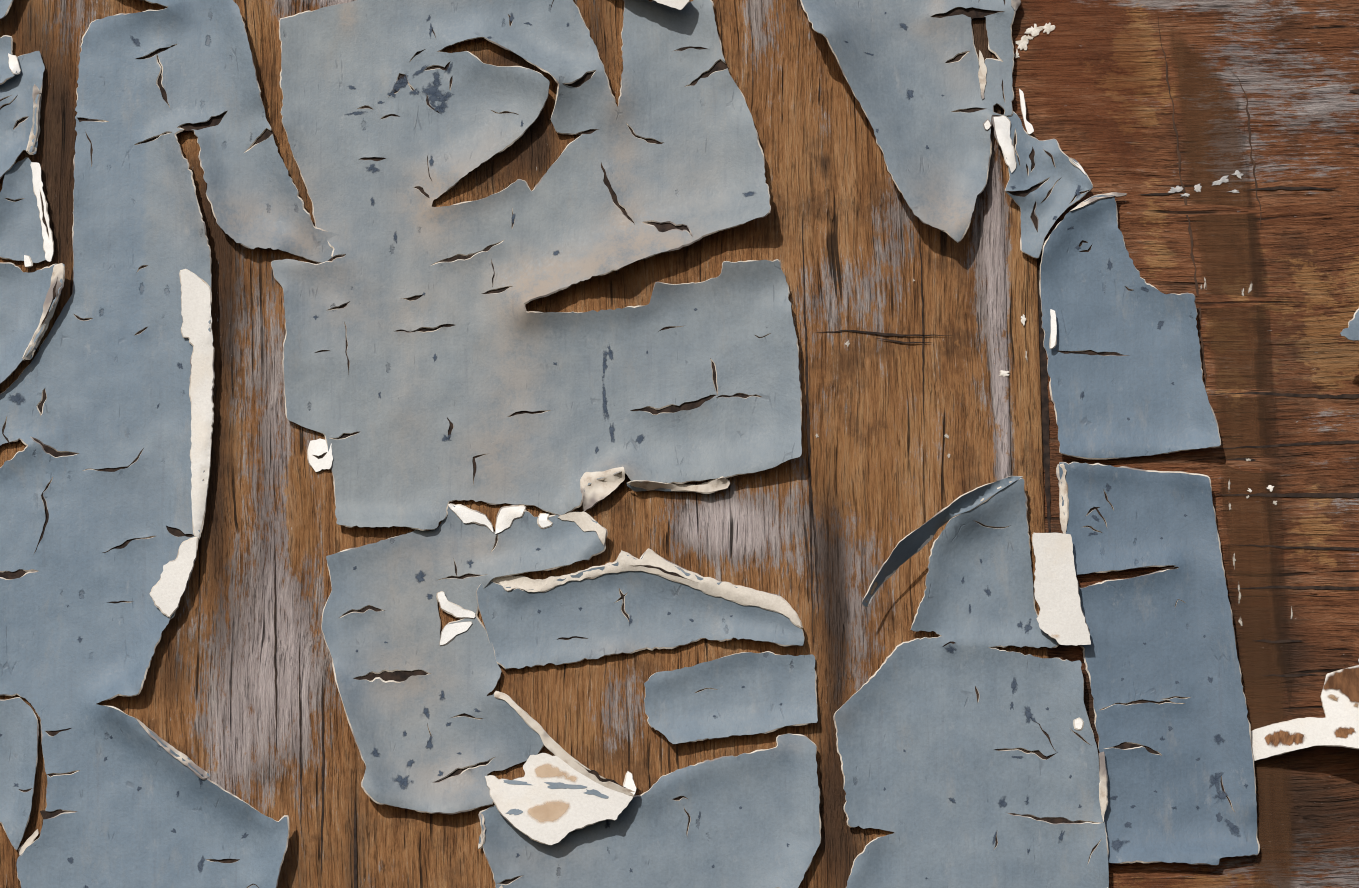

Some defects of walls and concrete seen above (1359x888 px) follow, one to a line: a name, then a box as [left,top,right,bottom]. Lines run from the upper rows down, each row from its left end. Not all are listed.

peeling [0,0,821,888]
peeling [800,0,1359,888]